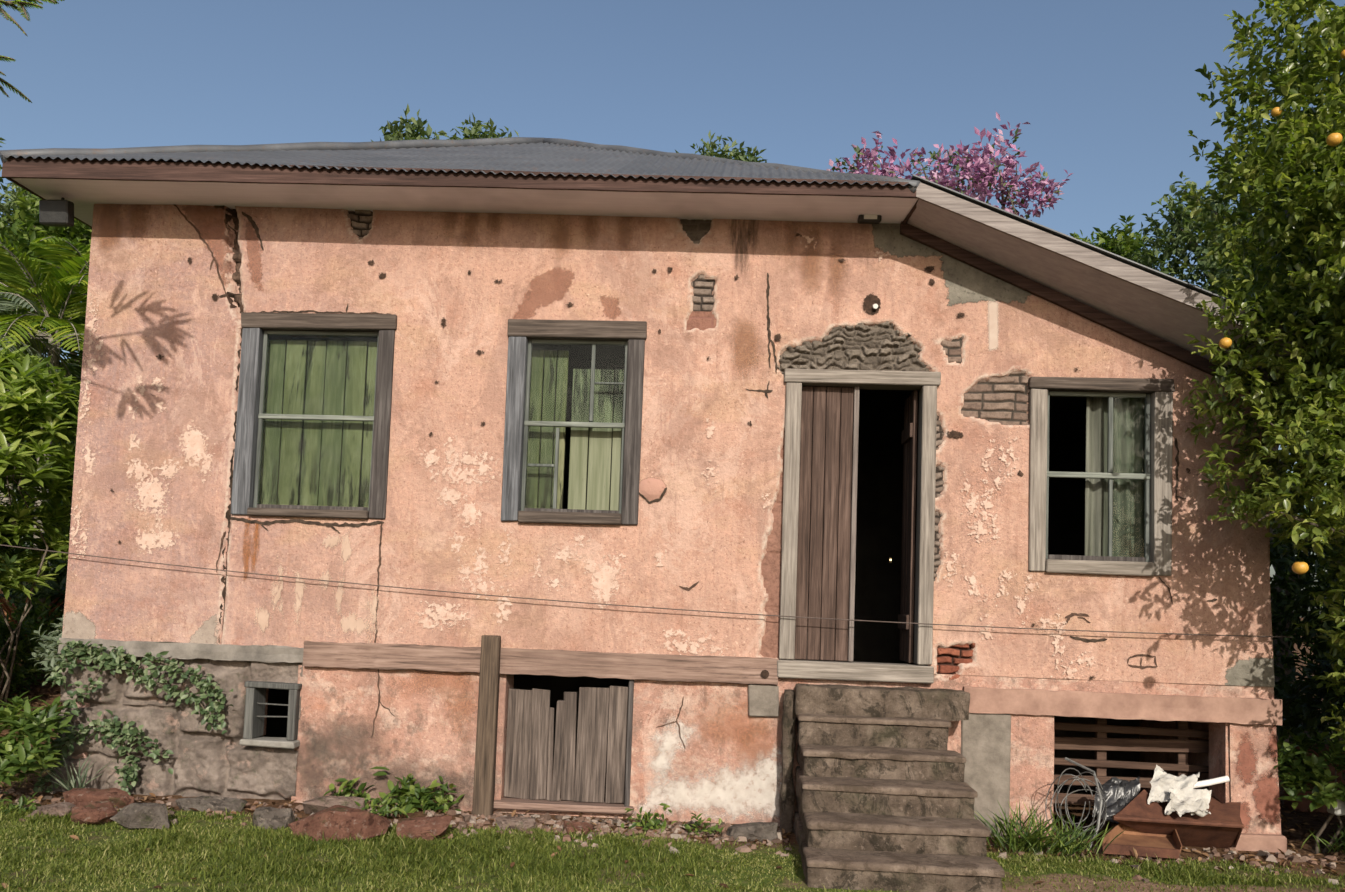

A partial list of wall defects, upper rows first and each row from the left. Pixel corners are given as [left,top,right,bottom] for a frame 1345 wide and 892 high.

spalling [347,210,373,240]
spalling [686,274,717,331]
crack [747,273,777,398]
spalling [774,321,930,374]
peeling [110,374,218,559]
crack [173,204,395,738]
peeling [411,432,514,634]
peeling [529,533,626,609]
spalling [934,371,1099,680]
crack [656,696,685,748]
damp [640,722,782,817]